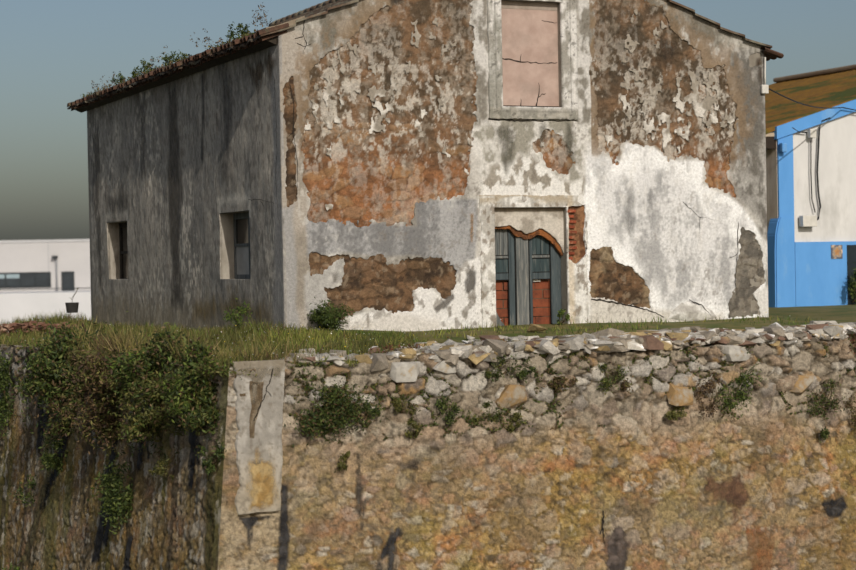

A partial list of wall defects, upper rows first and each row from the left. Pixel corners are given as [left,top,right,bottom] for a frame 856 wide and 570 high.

leakage [168,87,182,303]
spalling [283,0,478,227]
spalling [532,129,575,175]
spalling [589,0,738,198]
spalling [309,251,457,322]
spalling [495,205,651,309]
spalling [728,227,765,318]
leakage [22,409,71,570]
leakage [92,440,118,570]
leakage [240,485,290,570]
leakage [356,455,366,528]
leakage [378,527,402,570]